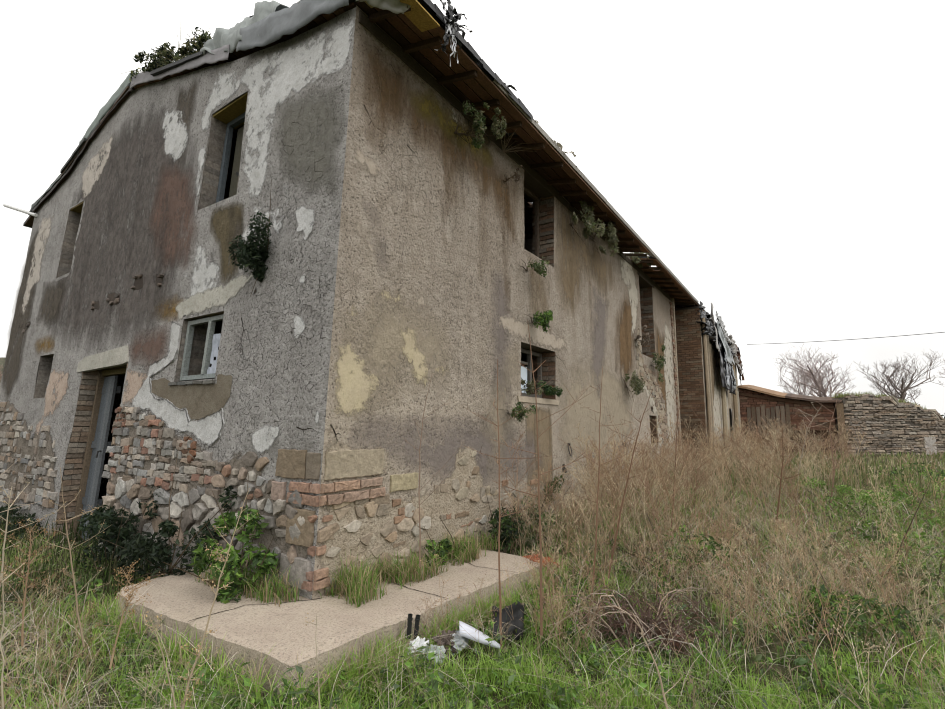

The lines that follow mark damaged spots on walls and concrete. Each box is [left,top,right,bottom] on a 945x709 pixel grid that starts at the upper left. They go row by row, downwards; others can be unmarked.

peeling [82,136,113,198]
peeling [163,110,188,161]
peeling [195,148,206,204]
peeling [201,20,354,241]
leakage [369,55,511,225]
leakage [3,82,196,396]
peeling [36,369,69,435]
peeling [111,246,261,463]
peeling [336,344,379,416]
peeling [401,328,444,385]
peeling [252,425,279,452]
flaking render [286,476,414,524]